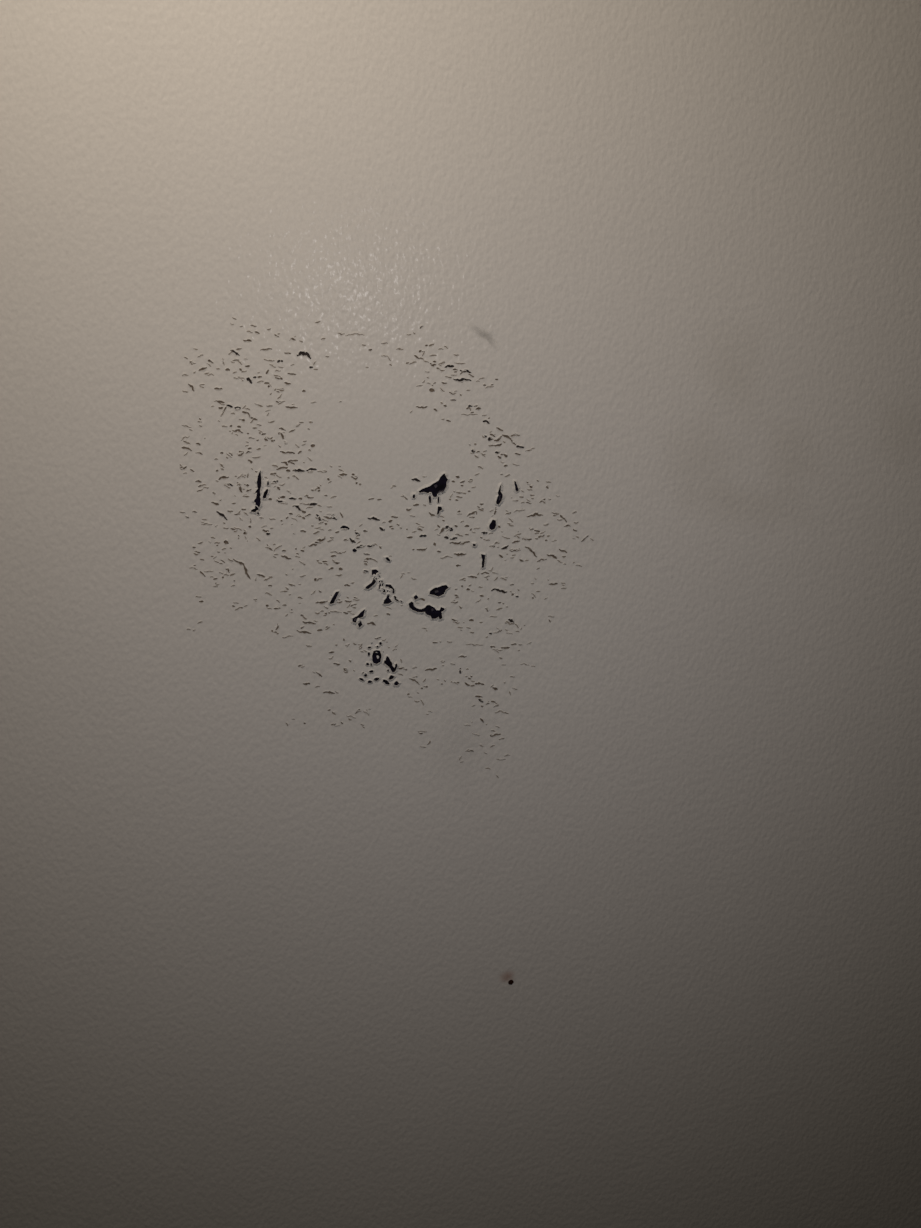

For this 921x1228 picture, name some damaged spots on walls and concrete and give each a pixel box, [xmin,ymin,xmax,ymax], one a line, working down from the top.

peeling [410,471,450,518]
peeling [486,482,506,532]
peeling [362,555,452,622]
peeling [350,607,367,630]
spalling [358,640,402,688]